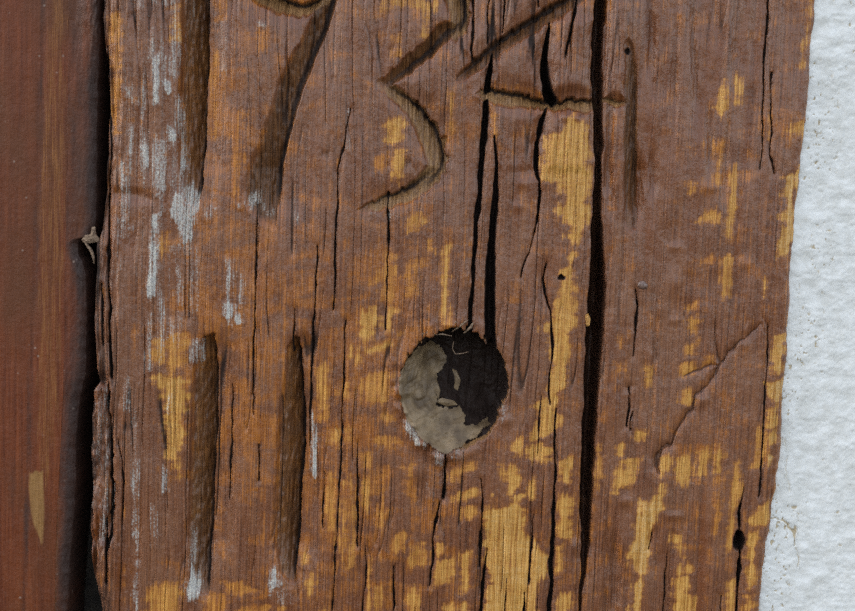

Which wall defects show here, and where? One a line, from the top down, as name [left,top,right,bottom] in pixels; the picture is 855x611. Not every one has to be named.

crack [292,107,368,611]
peeling [308,304,404,414]
peeling [298,401,431,611]
crack [384,191,392,332]
crack [428,454,448,587]
crack [466,0,506,358]
peeling [445,433,577,527]
crack [477,0,610,611]
peeling [552,541,578,611]
crack [653,323,770,611]
peeling [715,572,761,611]
peeling [759,322,792,494]